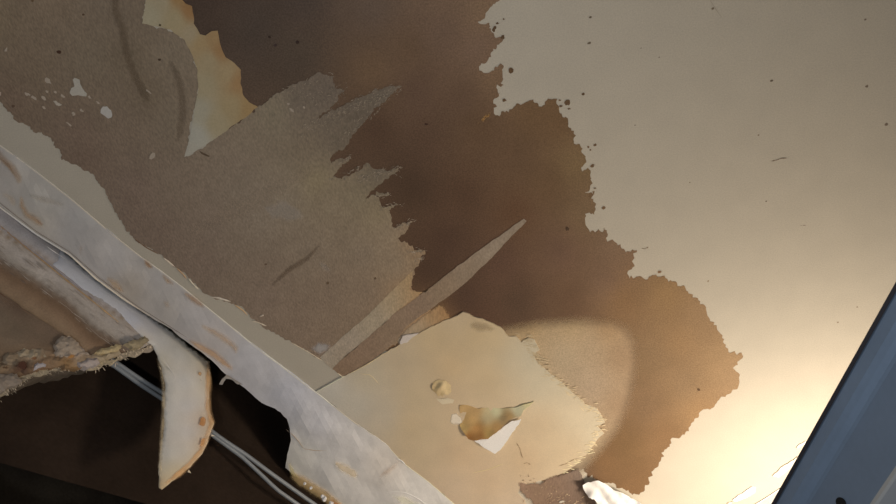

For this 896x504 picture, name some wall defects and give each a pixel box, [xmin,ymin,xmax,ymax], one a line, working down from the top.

peeling [0,0,426,360]
leakage [183,0,743,495]
peeling [519,469,597,504]